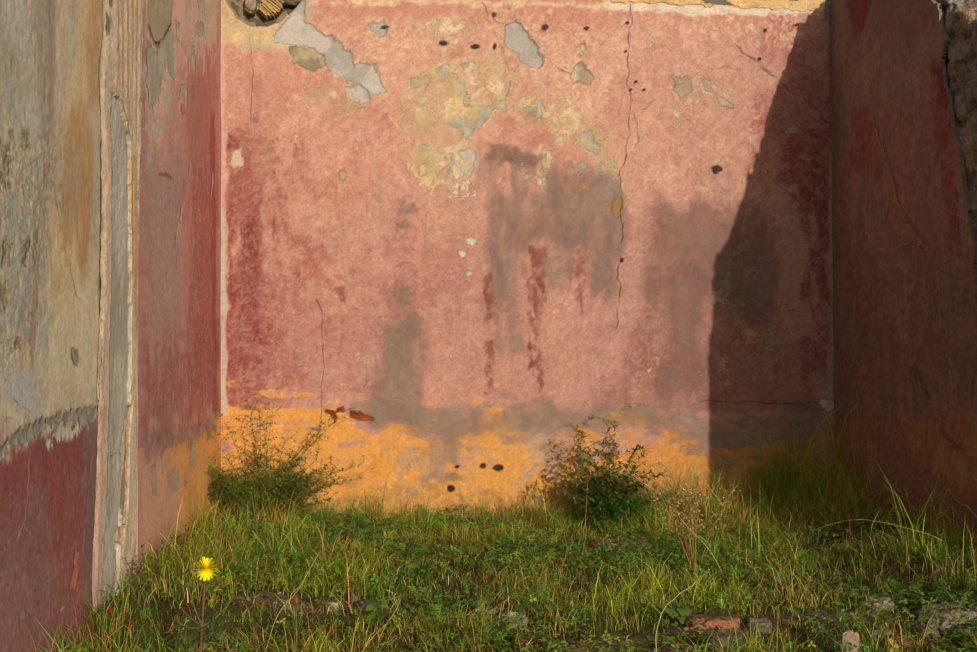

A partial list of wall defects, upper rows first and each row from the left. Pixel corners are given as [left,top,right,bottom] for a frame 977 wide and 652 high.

peeling [145,0,206,111]
peeling [257,0,389,123]
peeling [401,17,628,209]
peeling [660,74,734,123]
water stain [488,144,538,306]
water stain [536,171,624,292]
water stain [665,206,777,317]
peeling [0,94,131,605]
water stain [589,281,834,469]